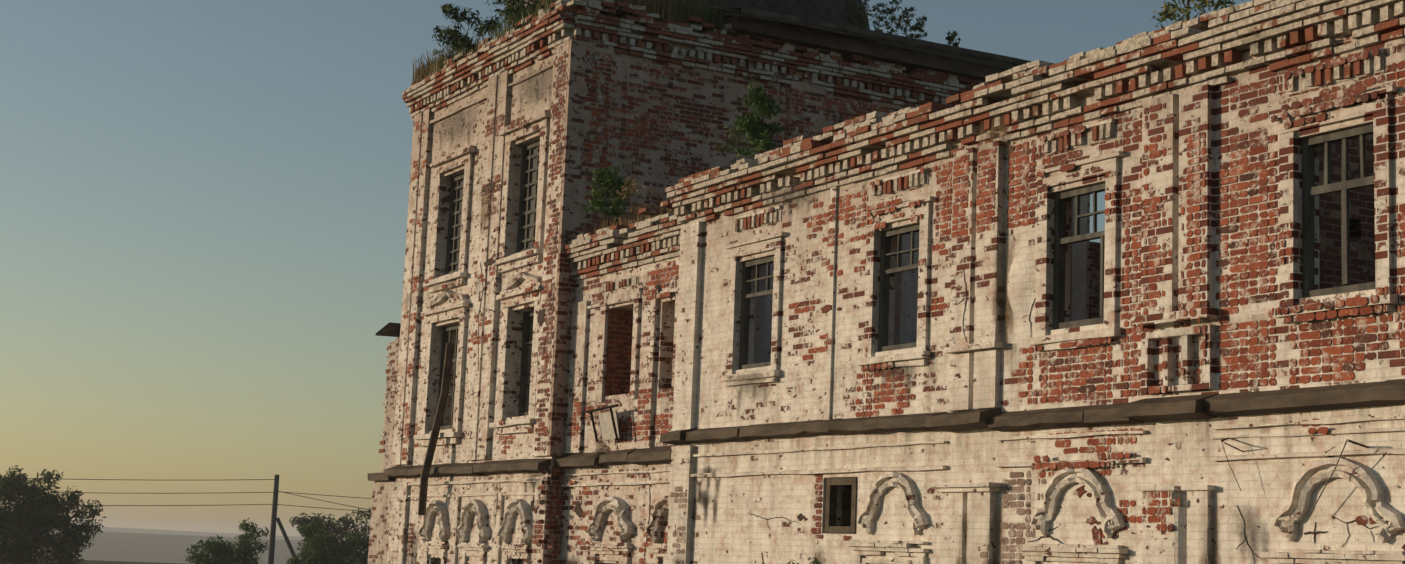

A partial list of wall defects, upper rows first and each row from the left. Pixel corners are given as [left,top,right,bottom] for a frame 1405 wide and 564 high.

peeling [764,43,1405,405]
peeling [855,362,916,417]
peeling [1301,419,1329,435]
spalling [797,474,823,539]
peeling [980,428,1143,564]
peeling [1085,490,1180,545]